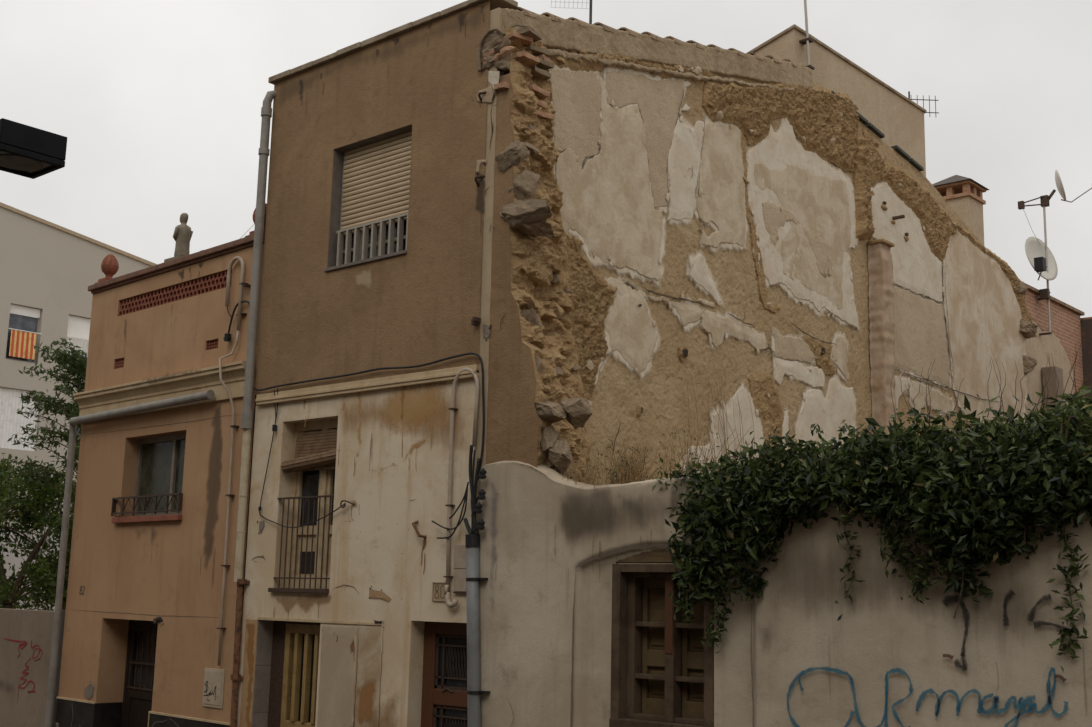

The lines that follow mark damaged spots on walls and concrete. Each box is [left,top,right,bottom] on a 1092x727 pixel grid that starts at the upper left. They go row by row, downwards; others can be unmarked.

spalling [476,26,1084,484]
water stain [200,407,222,581]
water stain [343,388,455,470]
water stain [353,682,390,727]